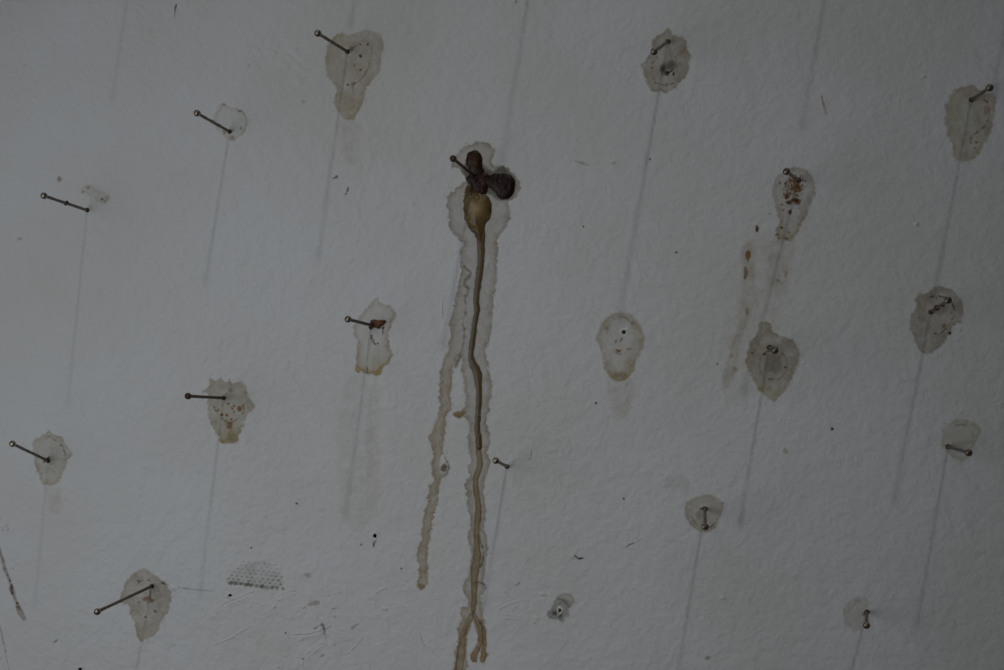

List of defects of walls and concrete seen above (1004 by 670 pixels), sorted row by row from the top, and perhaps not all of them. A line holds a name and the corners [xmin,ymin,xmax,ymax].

corrosion [783,178,803,214]
corrosion [369,319,386,345]
damp [418,143,515,666]